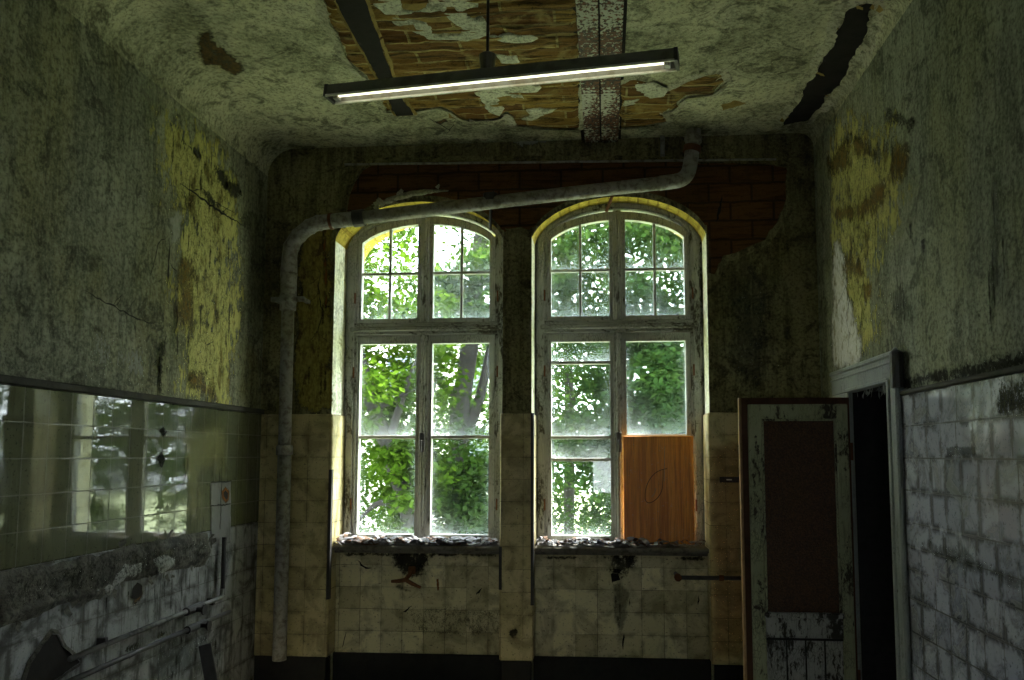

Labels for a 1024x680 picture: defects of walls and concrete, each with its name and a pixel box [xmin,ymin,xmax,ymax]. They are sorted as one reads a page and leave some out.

peeling [181,32,252,82]
flaking render [315,0,579,81]
flaking render [373,81,584,131]
flaking render [619,68,745,131]
crack [180,183,244,226]
flaking render [341,155,684,213]
flaking render [473,156,794,282]
peeling [835,144,910,305]
spalling [0,530,217,633]